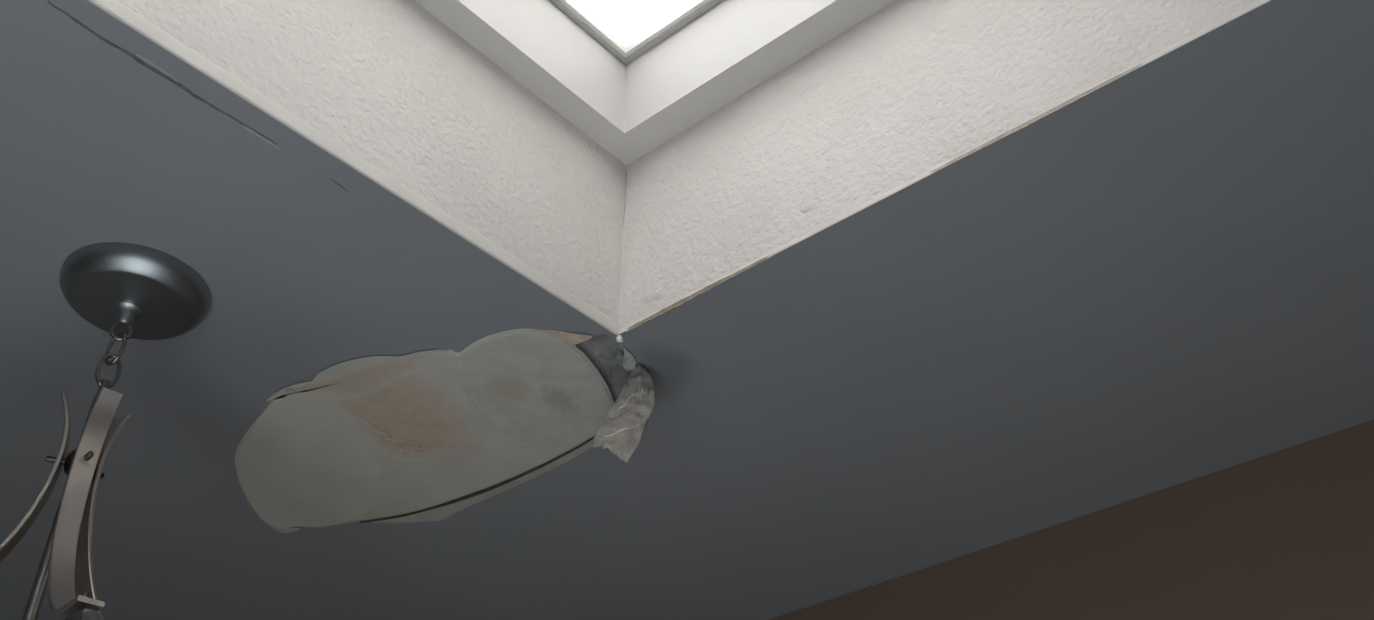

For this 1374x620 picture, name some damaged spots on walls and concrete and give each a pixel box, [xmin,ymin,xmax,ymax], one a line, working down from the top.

crack [47,0,281,149]
flaking render [235,328,655,533]